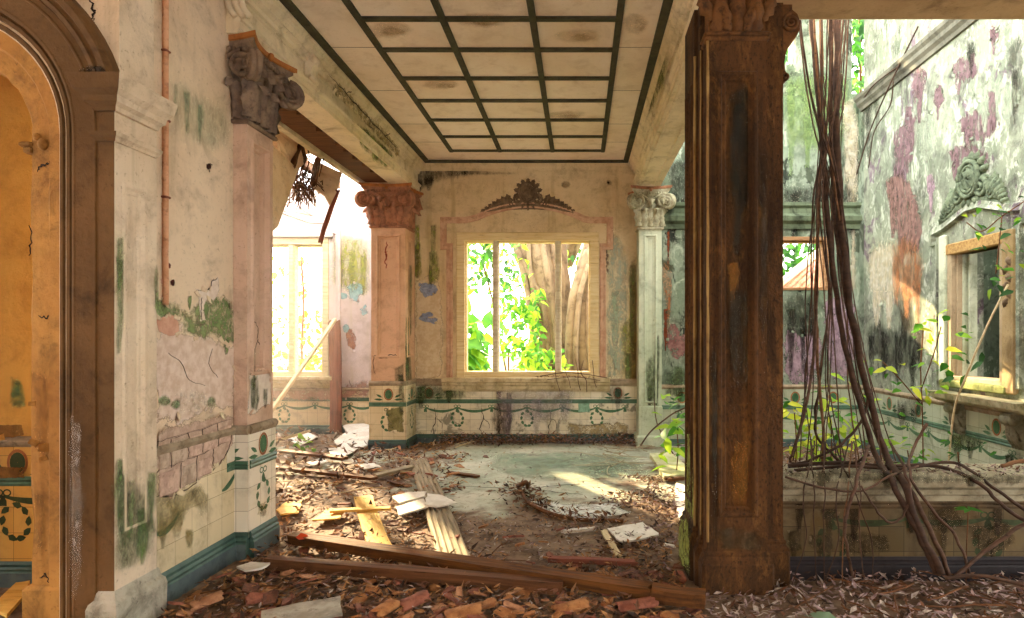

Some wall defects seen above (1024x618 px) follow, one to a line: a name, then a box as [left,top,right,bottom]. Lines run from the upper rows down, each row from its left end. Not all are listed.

peeling [989,25,999,55]
damp [418,171,473,188]
peeling [866,53,1020,328]
peeling [194,278,219,322]
peeling [343,324,356,353]
peeling [341,281,367,315]
peeling [414,276,443,379]
damp [785,296,814,372]
damp [869,290,922,387]
flaking render [157,313,236,499]